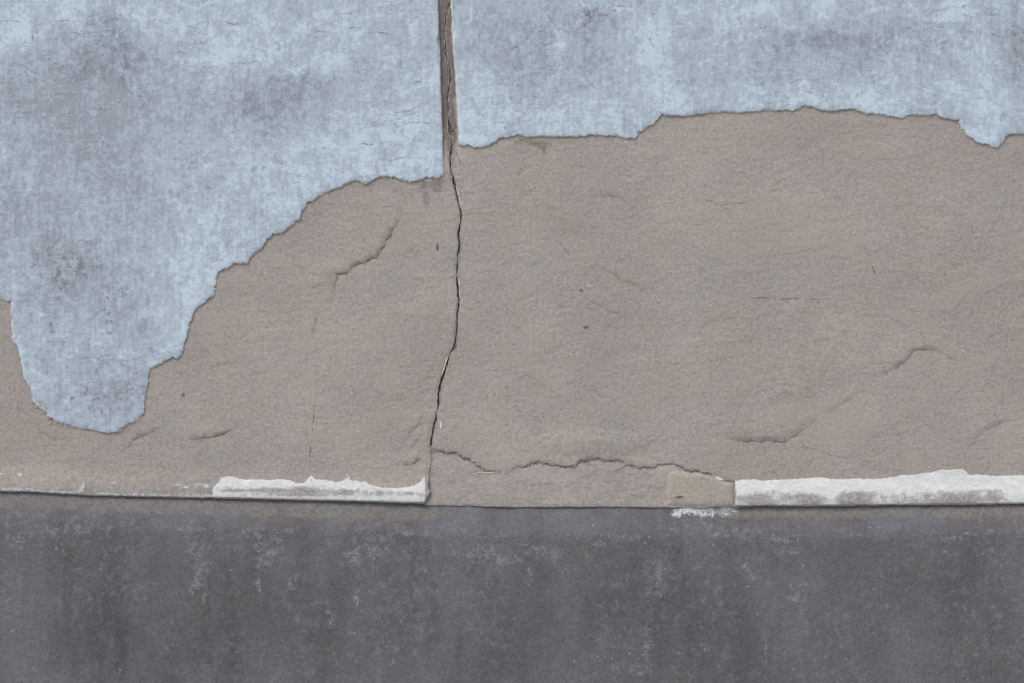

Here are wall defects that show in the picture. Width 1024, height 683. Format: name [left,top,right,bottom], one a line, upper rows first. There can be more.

peeling [0,0,1024,508]
crack [522,457,638,470]